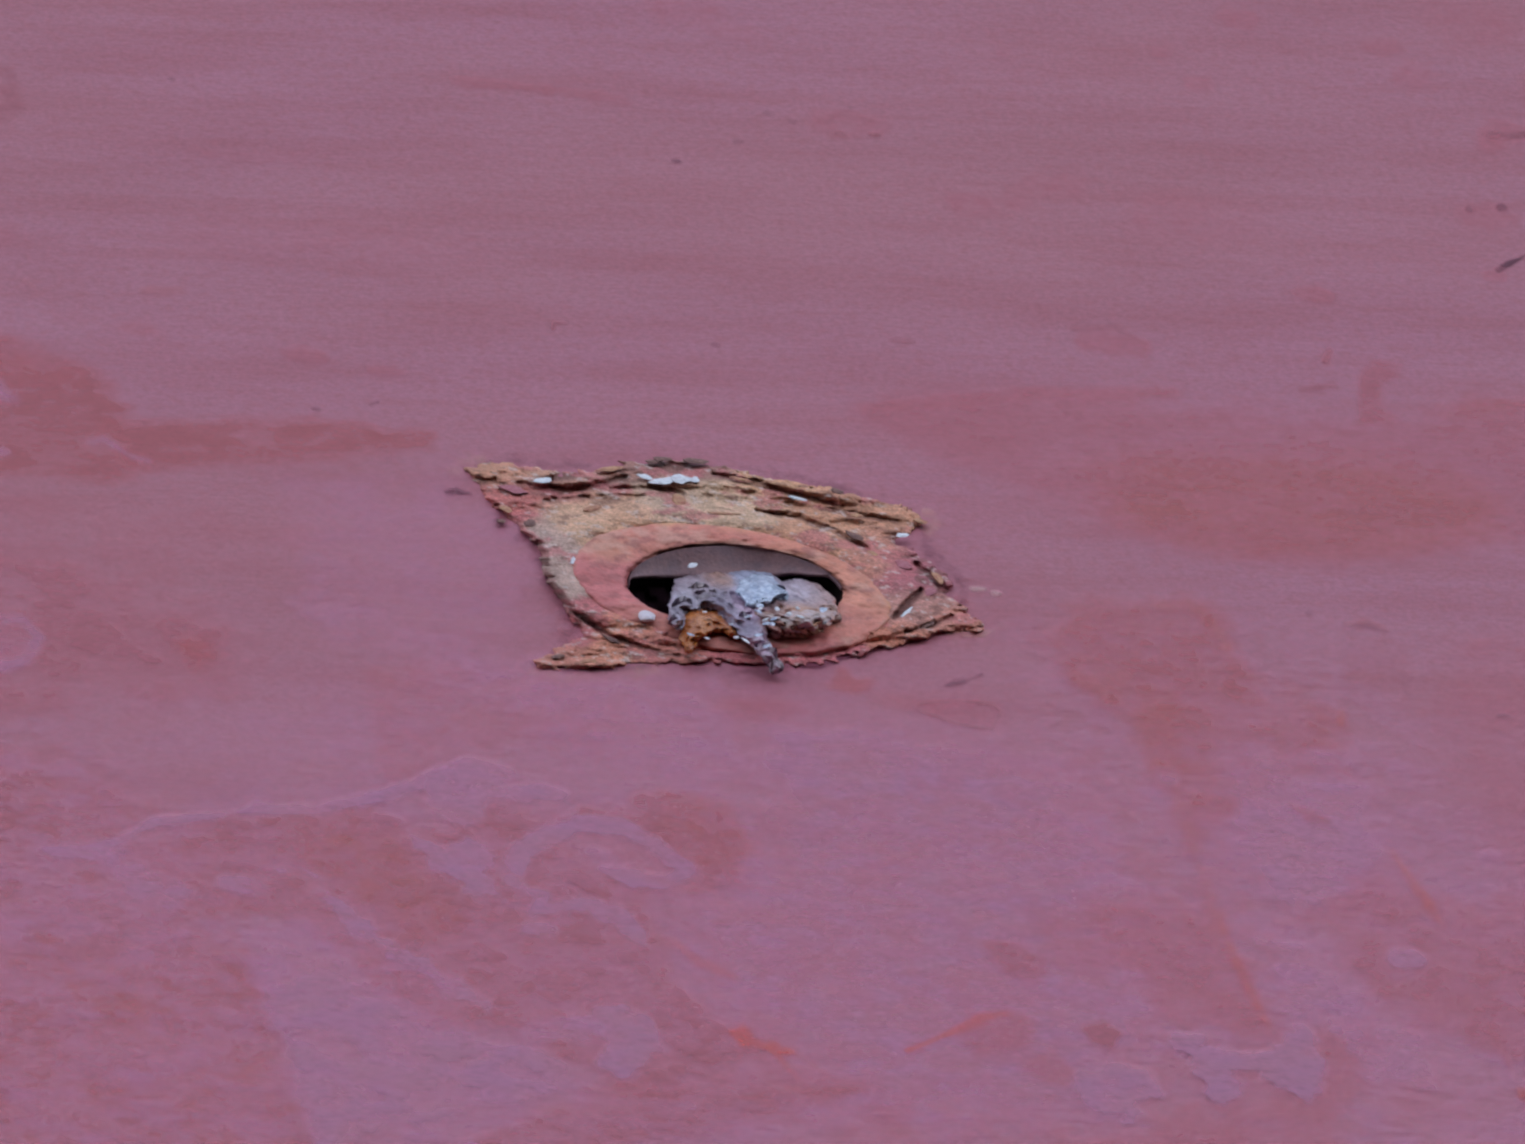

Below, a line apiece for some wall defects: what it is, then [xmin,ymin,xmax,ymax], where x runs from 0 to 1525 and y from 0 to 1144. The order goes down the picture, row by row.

spalling [463,456,985,672]